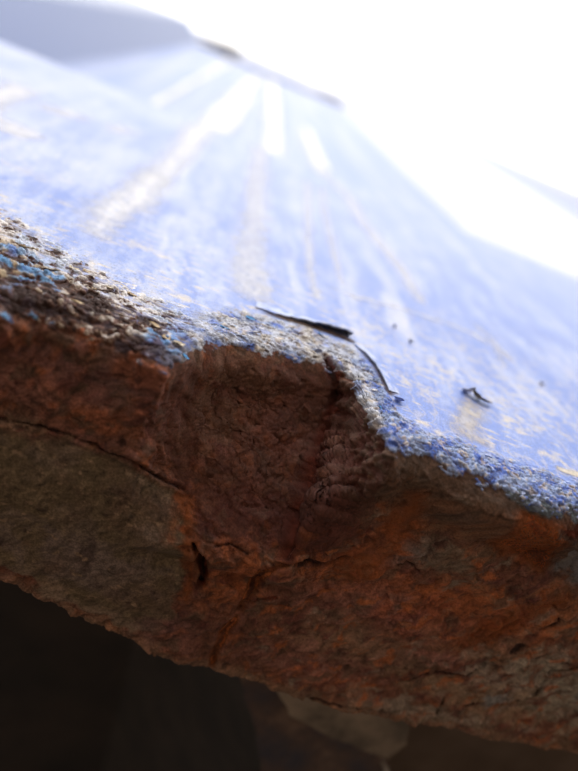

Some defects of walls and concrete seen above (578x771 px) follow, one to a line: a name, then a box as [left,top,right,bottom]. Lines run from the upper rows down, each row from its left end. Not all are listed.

peeling [0,208,578,523]
crack [324,358,338,381]
crack [16,421,65,433]
crack [84,440,179,489]
crack [193,543,247,582]
crack [286,527,348,567]
crack [209,570,276,665]